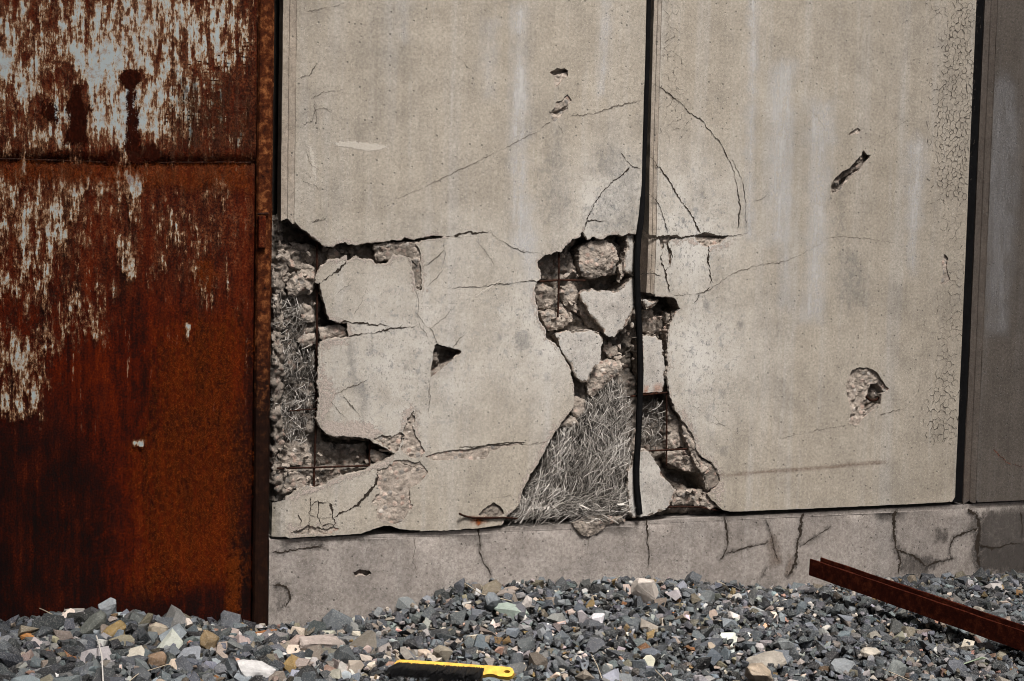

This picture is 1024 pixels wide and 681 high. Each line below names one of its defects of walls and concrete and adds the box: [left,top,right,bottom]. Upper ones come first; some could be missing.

corrosion [41,84,94,146]
corrosion [103,69,252,166]
crack [300,63,336,125]
spalling [550,68,571,121]
crack [391,0,892,303]
spalling [831,153,867,192]
crack [786,0,981,445]
spalling [269,214,522,524]
spalling [479,229,735,526]
spalling [846,367,888,425]
crack [719,513,831,575]
crack [892,509,1023,573]